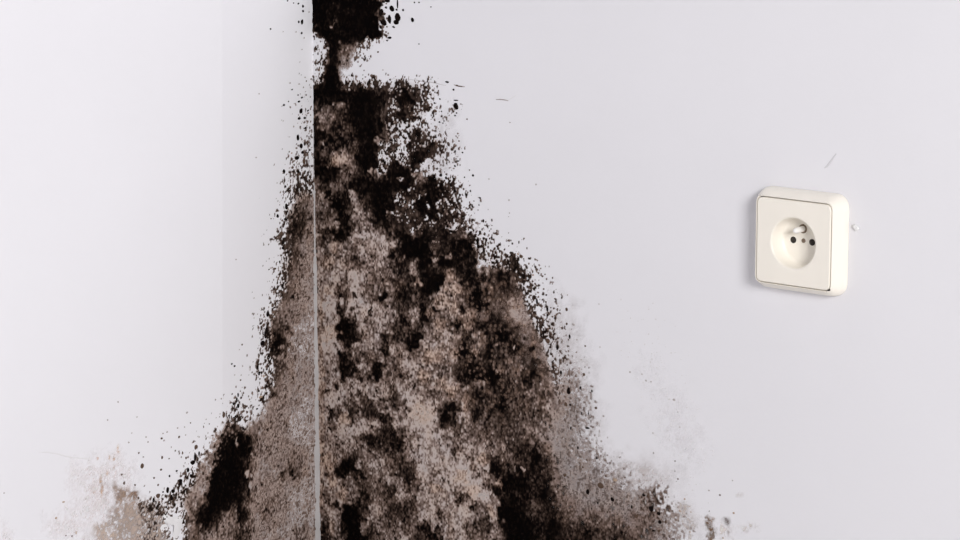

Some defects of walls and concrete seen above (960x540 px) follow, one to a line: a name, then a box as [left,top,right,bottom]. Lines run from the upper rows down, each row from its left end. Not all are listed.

damp [85,0,695,540]